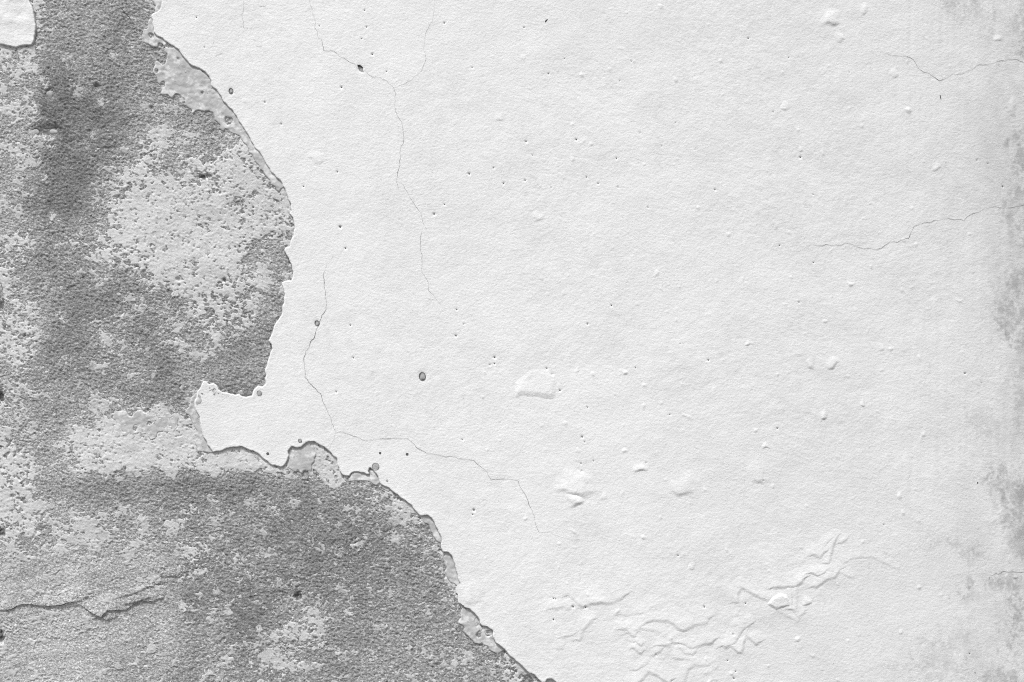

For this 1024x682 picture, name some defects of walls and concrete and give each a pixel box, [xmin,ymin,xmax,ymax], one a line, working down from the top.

peeling [0,0,555,682]